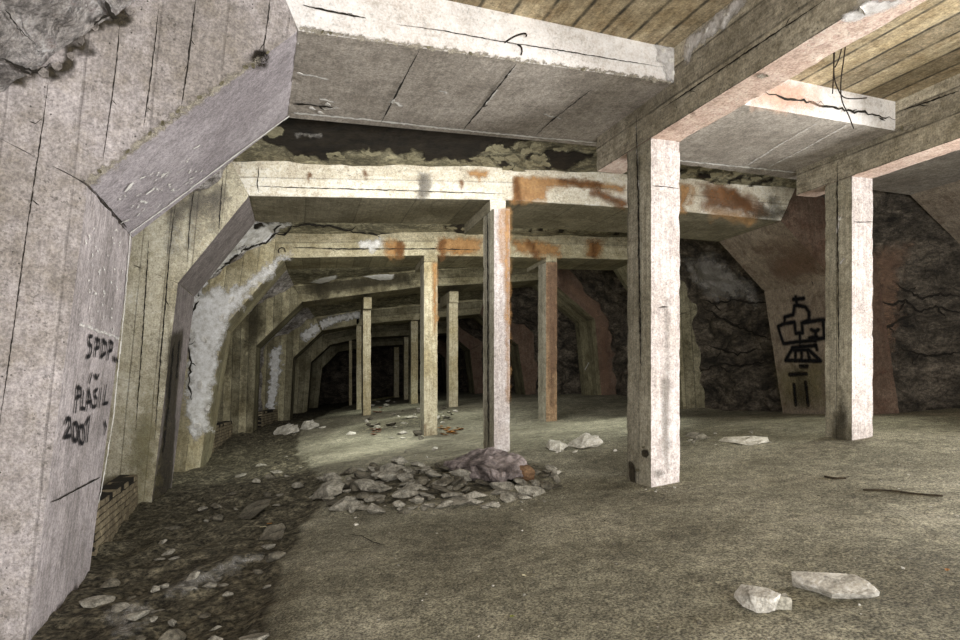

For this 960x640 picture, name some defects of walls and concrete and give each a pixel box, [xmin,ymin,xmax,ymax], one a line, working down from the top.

spalling [12,8,136,86]
spalling [262,99,594,172]
crack [766,91,958,120]
corrosion [680,185,691,212]
corrosion [703,185,762,223]
crack [135,193,194,433]
damp [79,112,597,503]
corrosion [385,241,404,256]
corrosion [433,238,480,328]
corrosion [504,176,627,373]
crack [188,338,196,400]